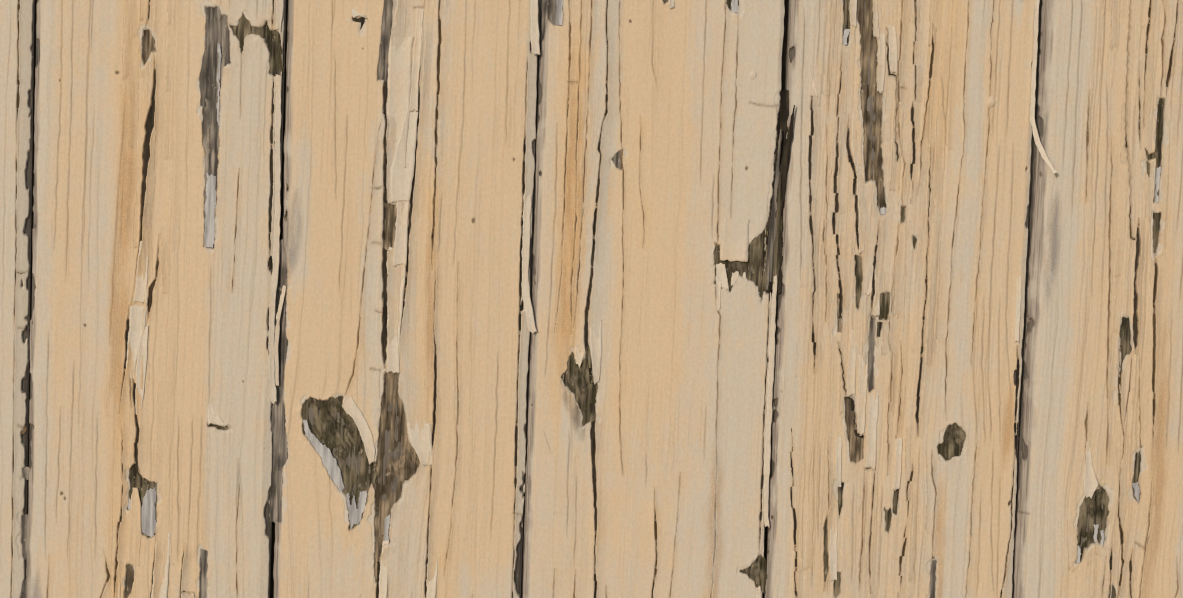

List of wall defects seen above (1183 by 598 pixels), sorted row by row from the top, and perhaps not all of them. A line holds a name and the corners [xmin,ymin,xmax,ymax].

crack [100,69,159,598]
peeling [118,463,170,598]
peeling [200,0,288,523]
peeling [343,394,375,465]
crack [374,562,382,598]
crack [347,0,441,390]
crack [425,280,459,595]
crack [512,139,526,598]
peeling [575,320,602,384]
crack [553,0,644,598]
peeling [714,89,789,528]
peeling [829,0,898,598]